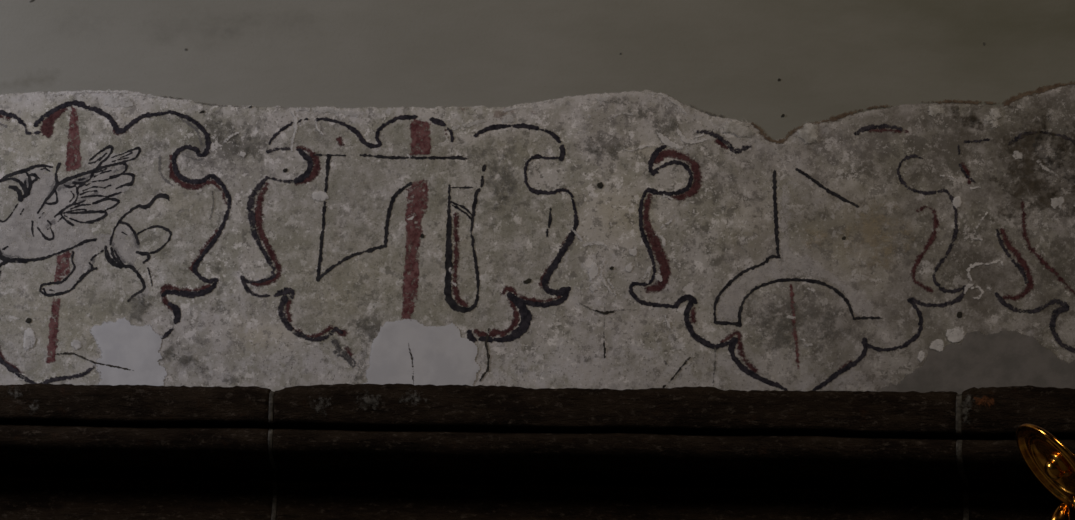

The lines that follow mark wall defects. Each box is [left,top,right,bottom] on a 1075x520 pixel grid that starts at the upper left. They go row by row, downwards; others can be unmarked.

flaking render [0,81,1075,392]